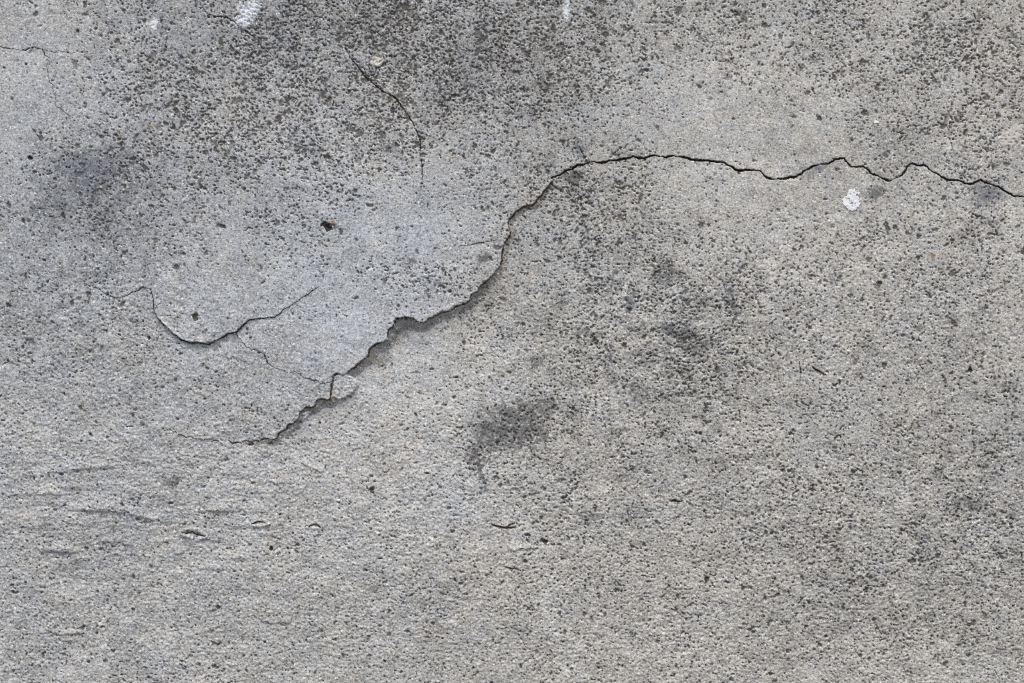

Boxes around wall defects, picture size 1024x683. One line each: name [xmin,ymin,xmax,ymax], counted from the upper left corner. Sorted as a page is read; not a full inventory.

crack [345,48,423,180]
crack [551,148,1024,197]
crack [89,286,330,384]